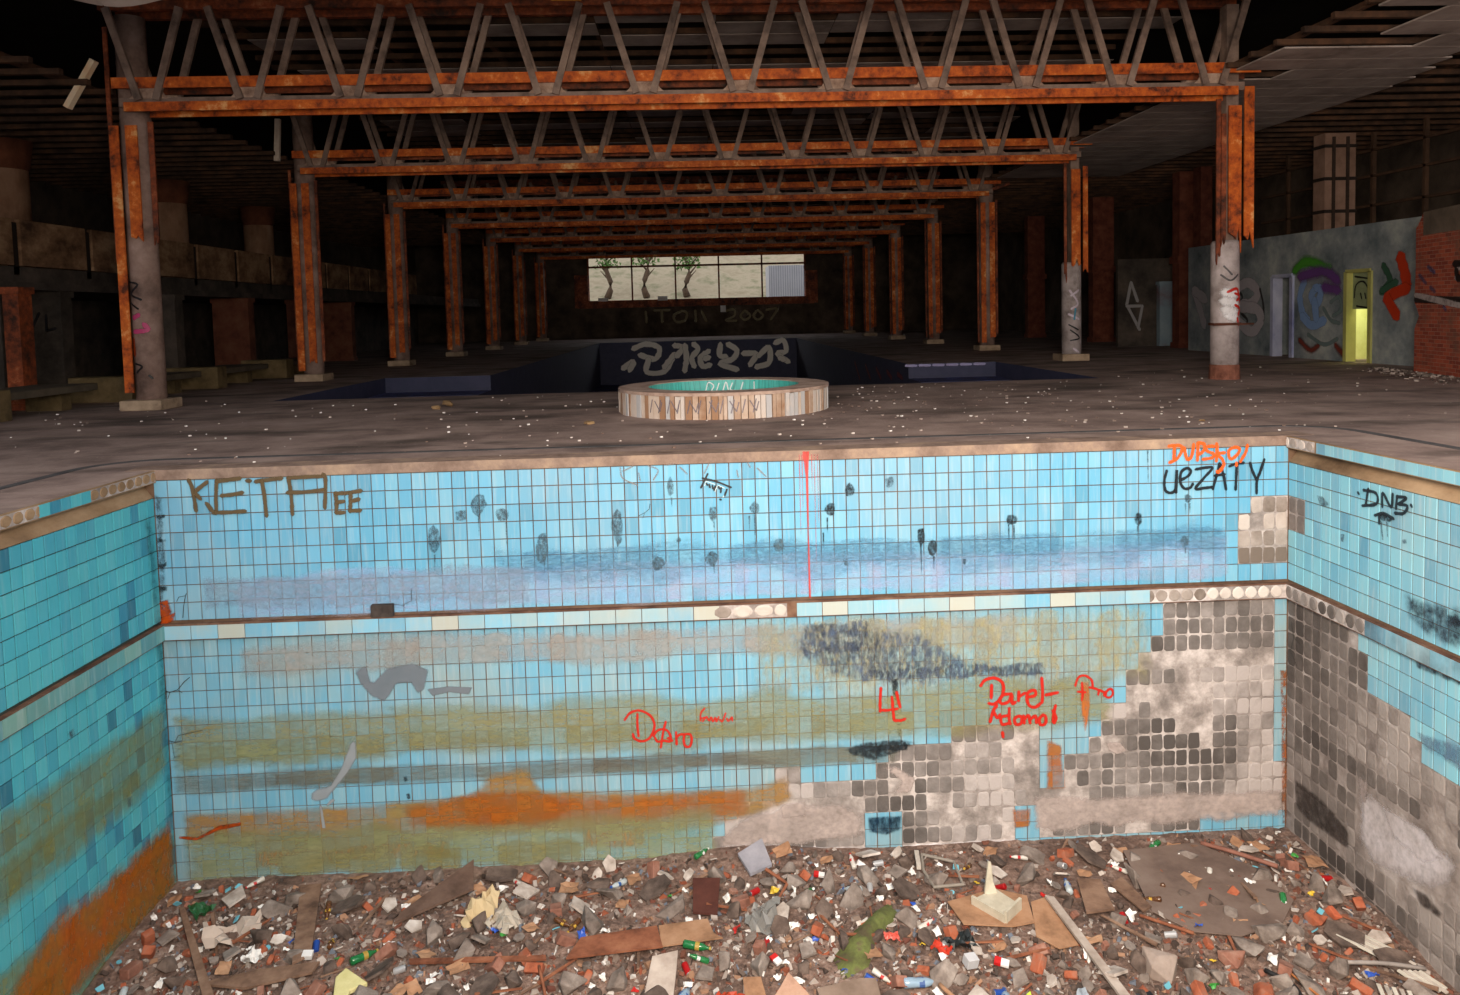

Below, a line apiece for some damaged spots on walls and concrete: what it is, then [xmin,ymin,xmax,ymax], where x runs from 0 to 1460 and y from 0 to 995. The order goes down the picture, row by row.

corrosion [16,772,789,995]
water stain [0,616,1140,897]
spalling [713,584,1460,993]
water stain [1409,598,1460,644]